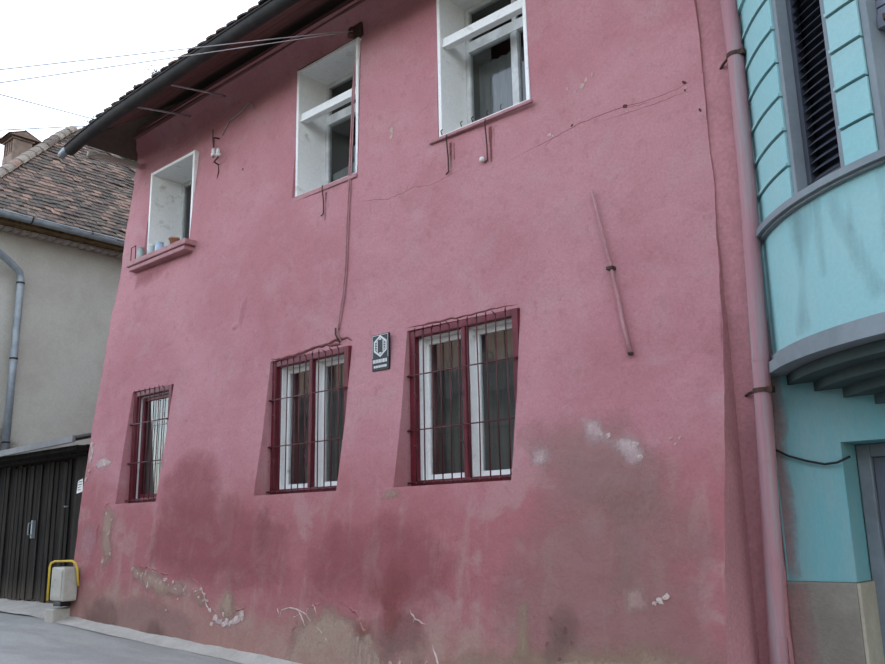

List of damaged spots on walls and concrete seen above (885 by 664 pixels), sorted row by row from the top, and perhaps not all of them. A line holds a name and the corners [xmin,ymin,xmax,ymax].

peeling [131,565,246,627]
flaking render [628,590,670,610]
flaking render [286,602,412,664]